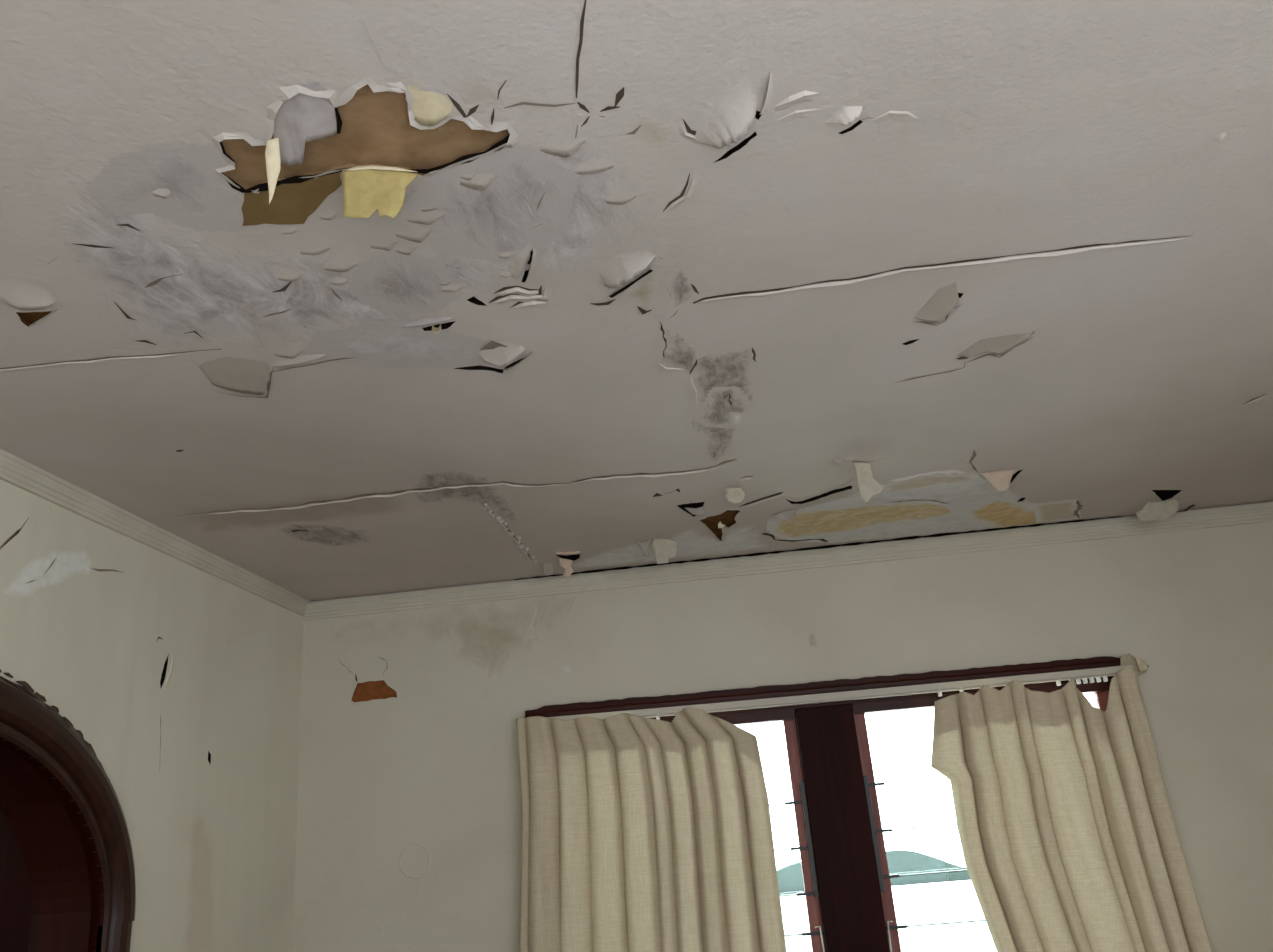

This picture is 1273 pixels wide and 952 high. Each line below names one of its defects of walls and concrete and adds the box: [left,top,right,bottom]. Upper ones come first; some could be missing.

crack [505,0,641,138]
leakage [0,15,696,369]
spalling [212,76,519,226]
crack [663,119,700,212]
crack [692,236,1191,306]
crack [0,349,222,372]
flaking render [648,263,766,468]
peeling [895,331,1035,383]
crack [0,518,30,551]
spalling [559,450,1087,578]
peeling [1136,490,1195,522]
spalling [338,657,400,706]